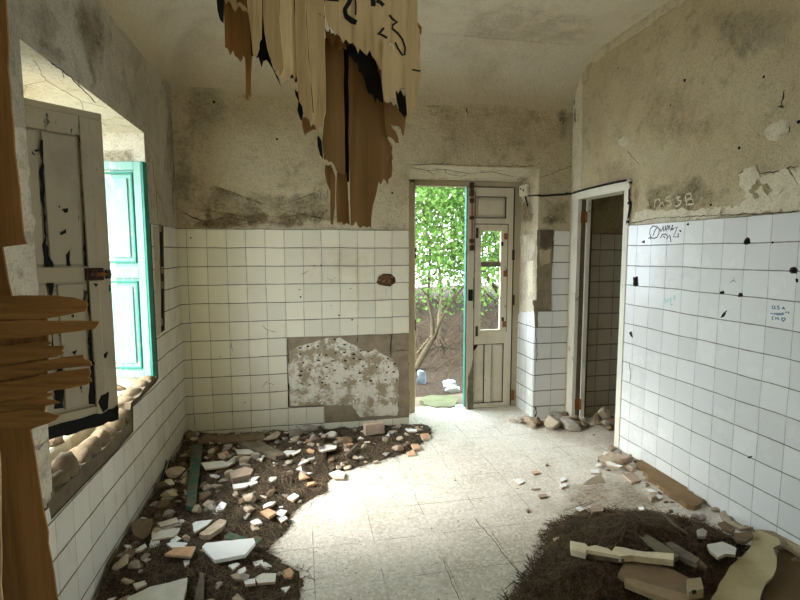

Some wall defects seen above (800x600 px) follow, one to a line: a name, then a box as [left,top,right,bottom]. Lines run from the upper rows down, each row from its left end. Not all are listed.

crack [24,60,104,124]
leakage [210,189,329,226]
peeling [631,166,800,225]
spalling [378,274,394,284]
peeling [519,229,554,328]
spalling [287,334,410,422]